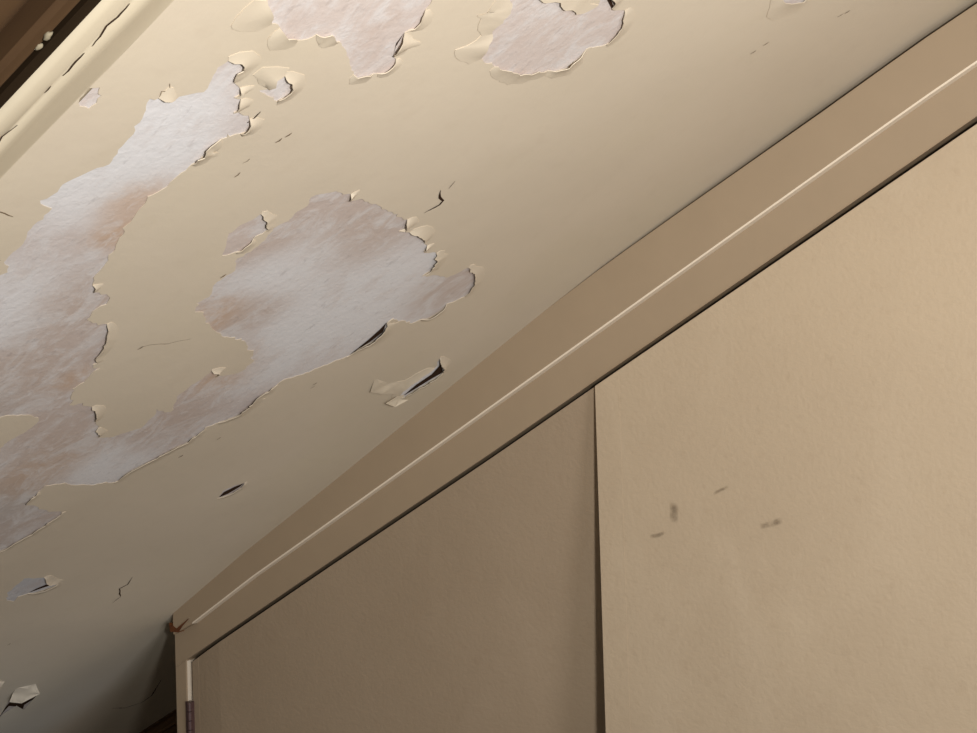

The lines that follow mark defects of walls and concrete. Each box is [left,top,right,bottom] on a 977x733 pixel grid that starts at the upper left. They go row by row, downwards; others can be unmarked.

peeling [454,0,635,85]
peeling [0,0,485,554]
peeling [6,575,63,601]
peeling [0,684,40,716]